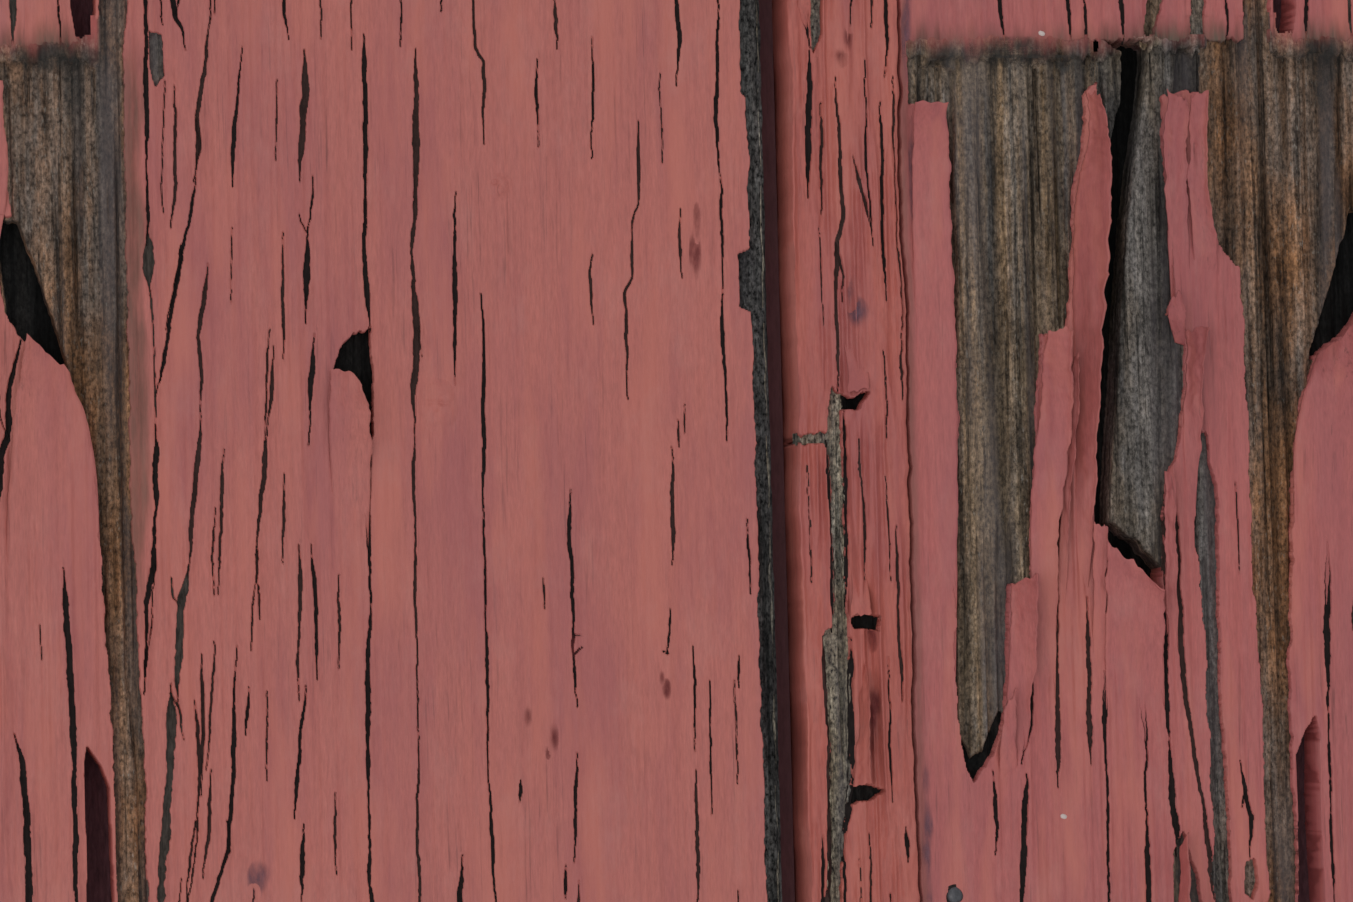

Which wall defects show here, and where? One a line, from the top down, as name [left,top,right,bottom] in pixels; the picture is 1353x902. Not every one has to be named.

crack [14,735,33,902]
crack [39,567,79,902]
peeling [0,0,149,902]
crack [143,0,375,902]
peeling [329,329,373,542]
crack [400,0,421,902]
crack [452,192,523,902]
crack [588,0,682,400]
crack [804,0,910,902]
peeling [850,573,872,617]
peeling [853,662,872,787]
peeling [906,0,1353,902]